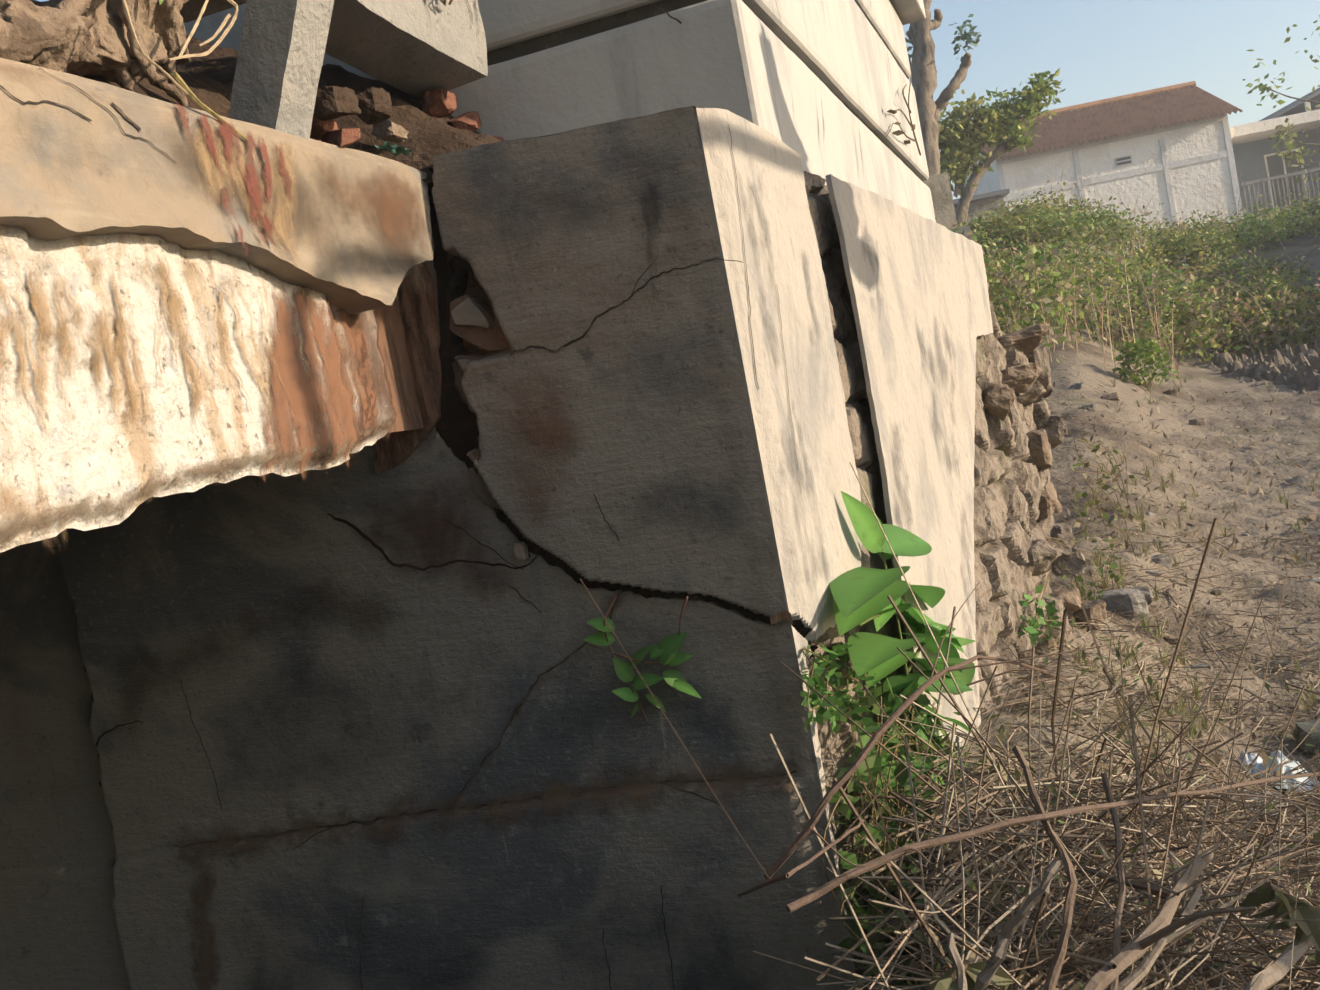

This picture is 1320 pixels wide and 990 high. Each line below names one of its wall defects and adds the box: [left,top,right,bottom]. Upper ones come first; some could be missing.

crack [0,68,175,162]
corrosion [195,134,294,244]
crack [428,168,486,469]
spalling [445,248,511,509]
crack [512,124,802,494]
spalling [0,414,396,548]
crack [327,507,818,659]
crack [594,494,620,541]
crack [84,667,143,786]